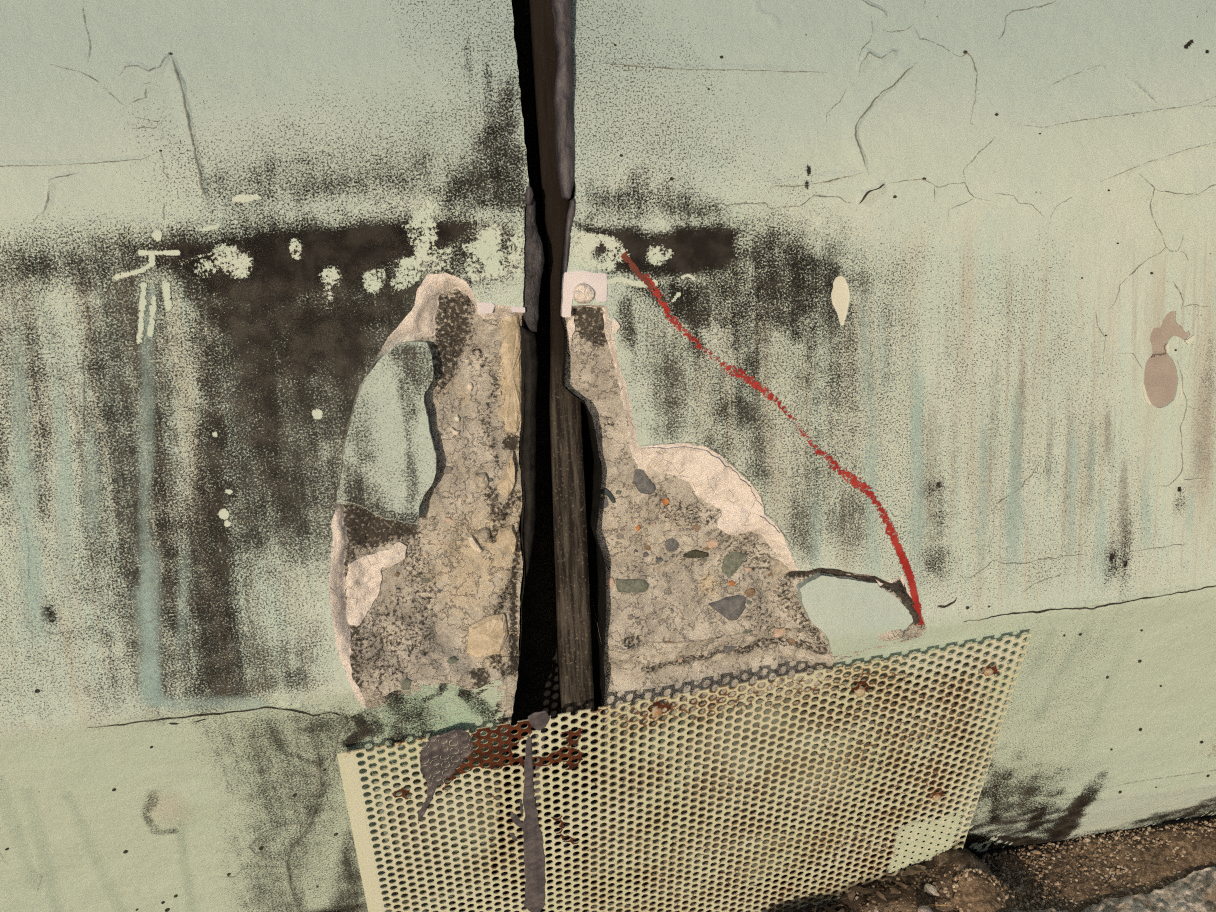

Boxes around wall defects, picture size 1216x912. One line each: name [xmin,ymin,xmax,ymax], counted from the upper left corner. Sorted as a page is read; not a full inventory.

crack [586,63,814,72]
crack [726,0,1070,216]
water stain [572,162,897,564]
peeling [831,276,850,326]
crack [1096,144,1215,367]
peeling [1142,311,1195,408]
water stain [0,40,529,912]
spalling [329,273,523,737]
spalling [562,305,927,727]
crack [645,442,1216,627]
corrosion [442,721,583,791]
water stain [952,741,1216,853]